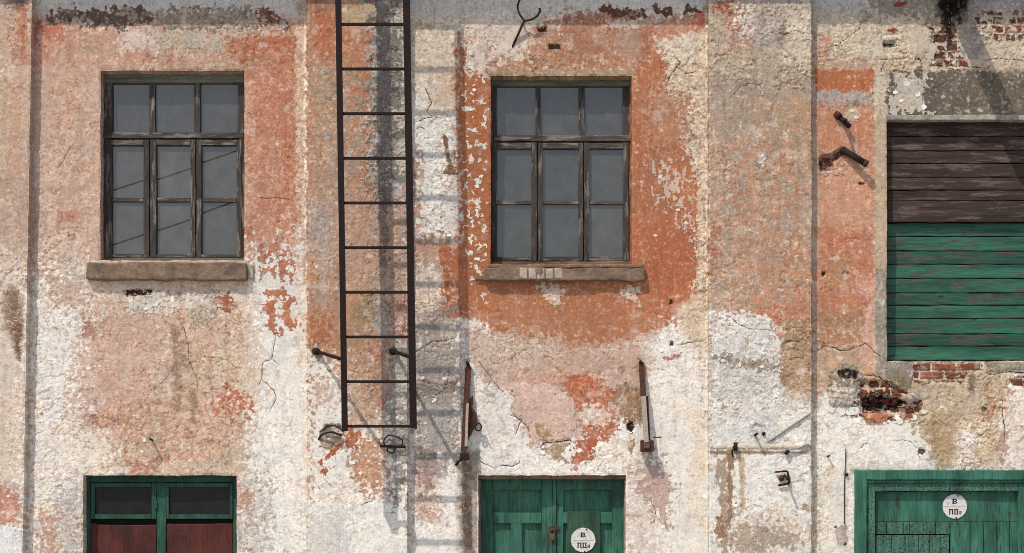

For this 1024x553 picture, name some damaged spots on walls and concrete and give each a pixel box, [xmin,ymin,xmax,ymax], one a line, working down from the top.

peeling [38,2,290,33]
peeling [598,3,702,21]
peeling [880,5,1024,115]
peeling [437,50,490,301]
peeling [643,149,702,243]
damp [4,287,22,361]
crack [153,324,278,408]
peeling [535,281,566,307]
peeling [541,370,649,471]
peeling [619,284,642,308]
crack [726,315,892,387]
flaking render [827,362,1024,424]